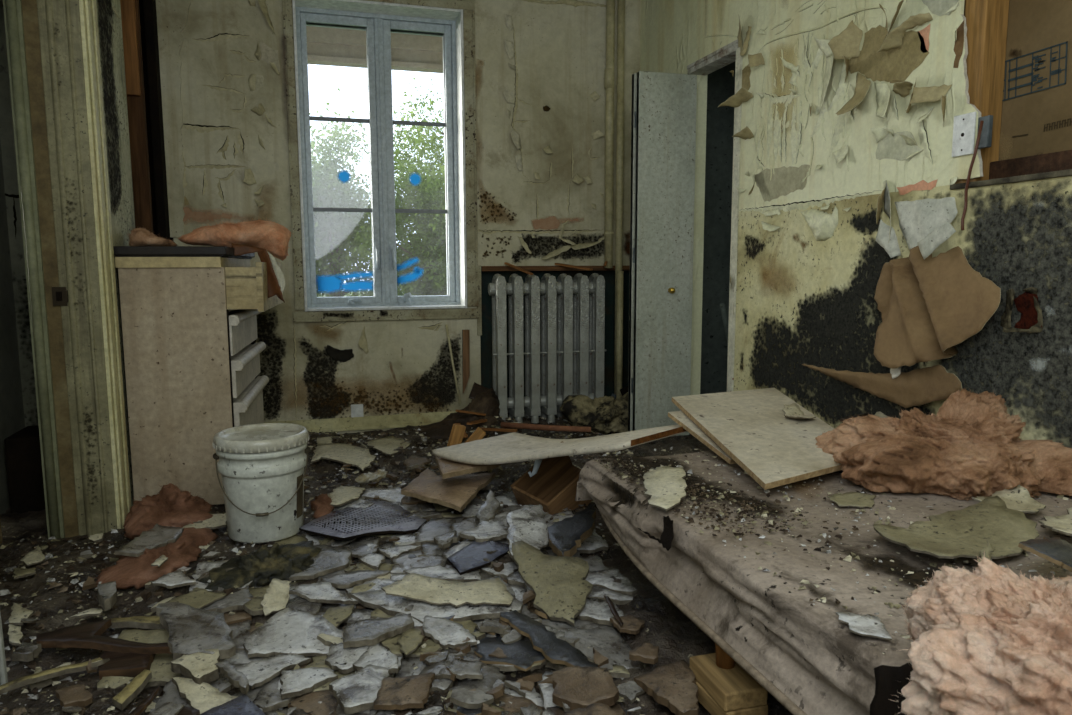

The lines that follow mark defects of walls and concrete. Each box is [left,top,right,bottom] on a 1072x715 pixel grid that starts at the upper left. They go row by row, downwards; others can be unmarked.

peeling [718,14,778,108]
peeling [780,0,959,162]
peeling [953,20,965,68]
peeling [732,126,754,140]
leakage [477,192,605,263]
peeling [736,164,811,232]
peeling [876,177,958,224]
leakage [257,310,462,419]
leakage [740,208,935,427]
leakage [939,182,1072,448]